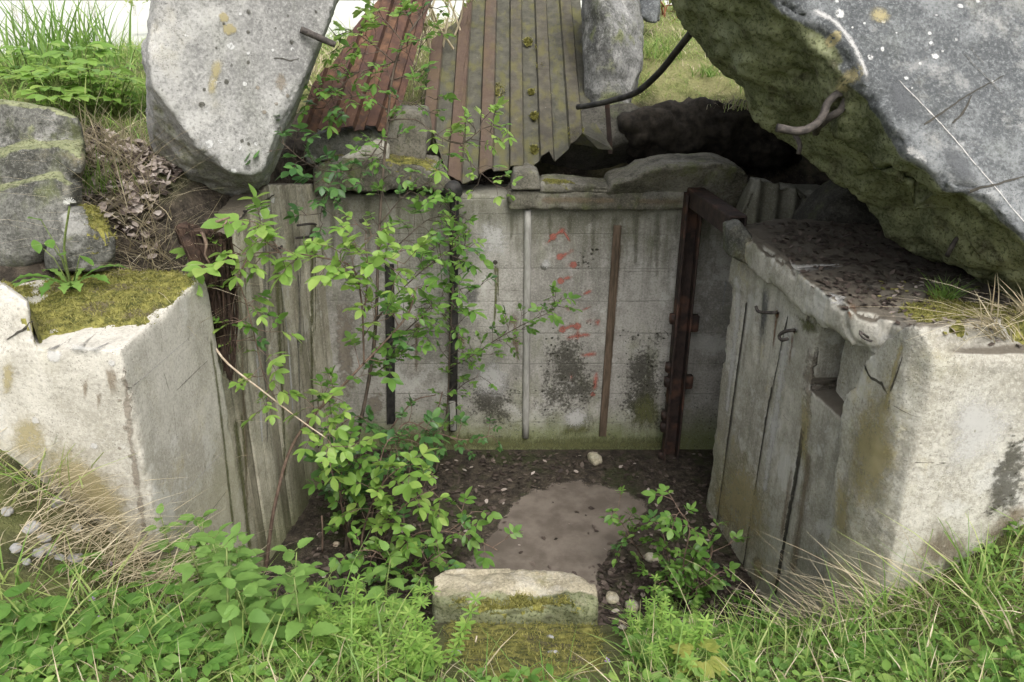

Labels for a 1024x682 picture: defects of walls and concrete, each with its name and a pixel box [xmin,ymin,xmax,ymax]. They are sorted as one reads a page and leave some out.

damp [463,364,517,424]
damp [535,328,595,426]
mould [618,329,666,427]
crack [864,357,916,417]
damp [955,404,1024,519]